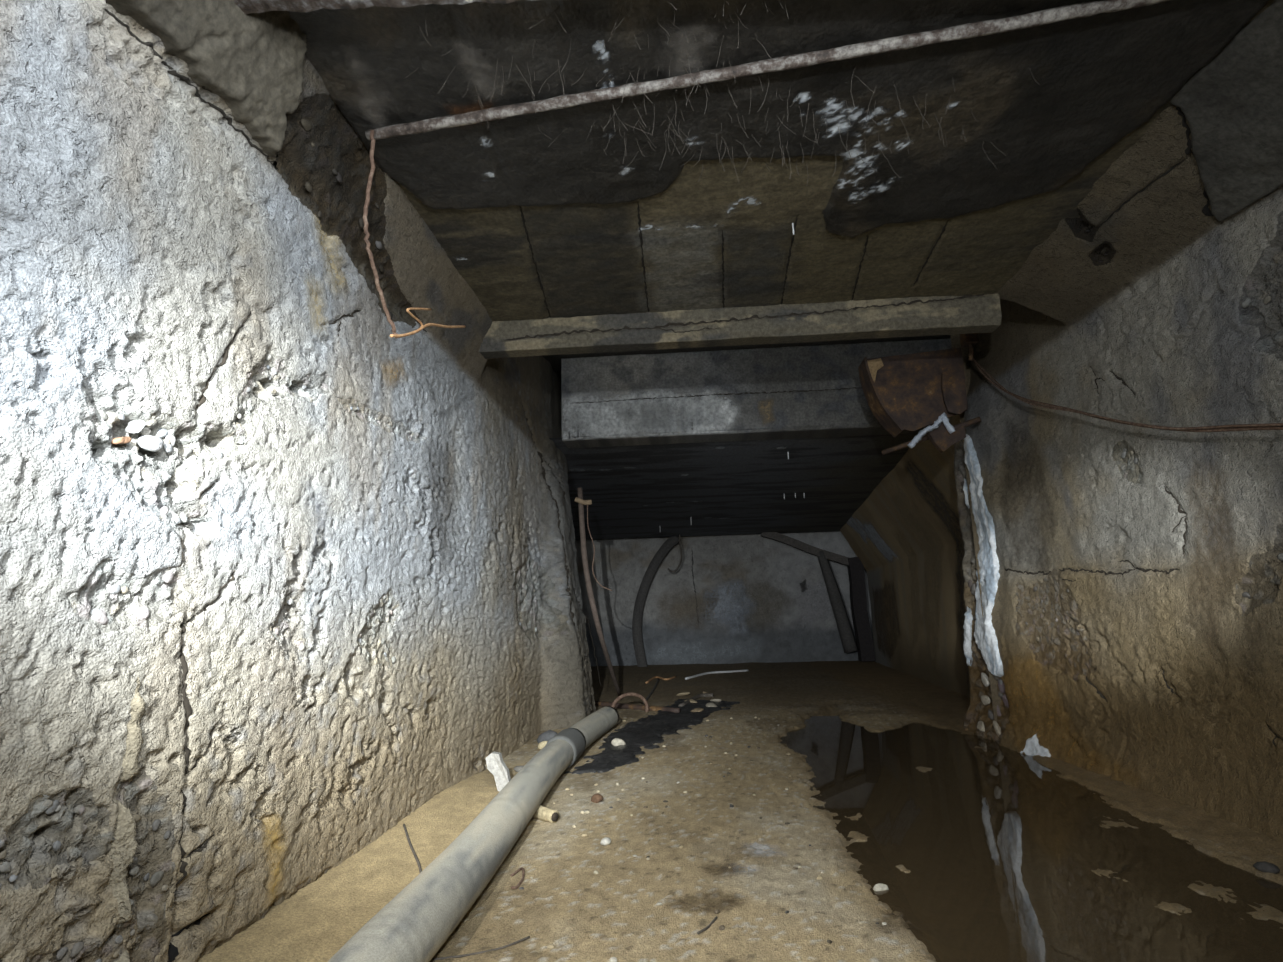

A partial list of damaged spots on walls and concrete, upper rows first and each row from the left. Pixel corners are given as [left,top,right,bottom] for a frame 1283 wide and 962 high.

leakage [839,144,886,199]
leakage [826,101,902,137]
spalling [1238,211,1283,361]
crack [194,310,251,419]
leakage [907,412,1043,677]
crack [1005,486,1187,582]
crack [176,565,237,885]
crack [168,913,210,962]